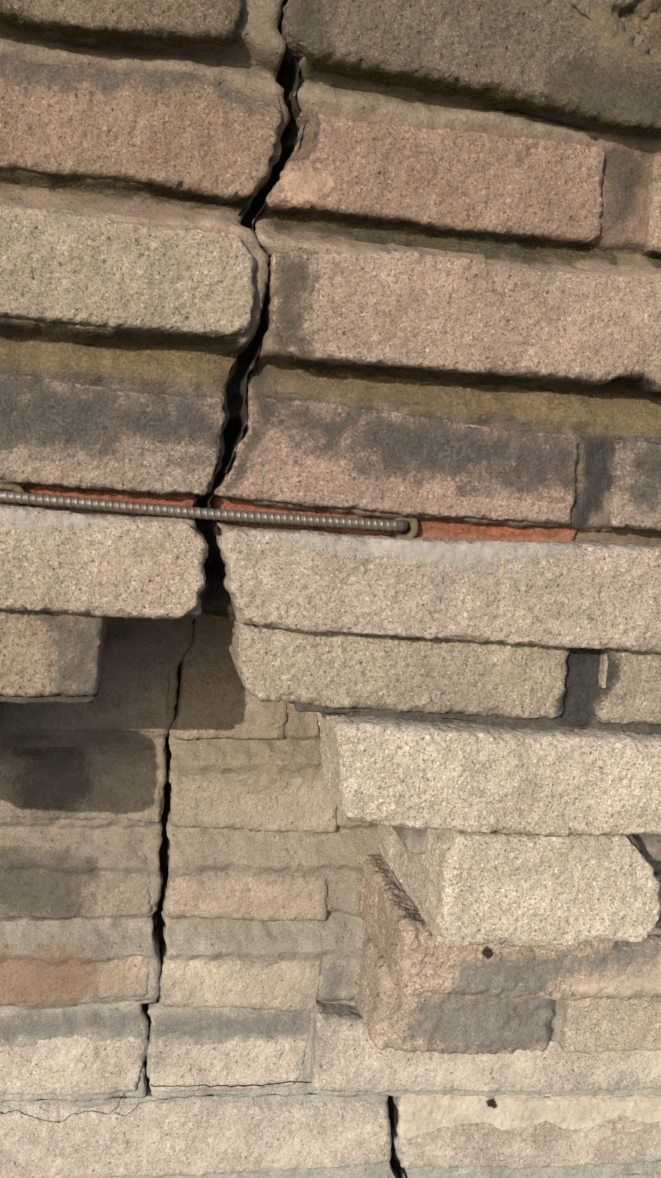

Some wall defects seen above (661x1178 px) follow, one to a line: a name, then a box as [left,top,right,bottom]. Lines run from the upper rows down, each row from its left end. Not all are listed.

crack [278,0,288,30]
crack [238,57,306,232]
corrosion [25,485,189,507]
crack [188,298,269,628]
corrosion [216,501,557,538]
crack [174,663,182,708]
crack [154,735,172,954]
crack [0,997,312,1123]
crack [387,1096,407,1178]